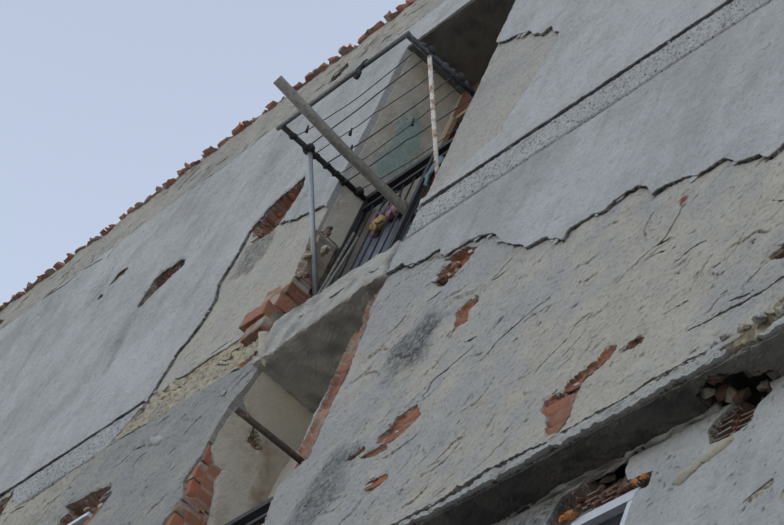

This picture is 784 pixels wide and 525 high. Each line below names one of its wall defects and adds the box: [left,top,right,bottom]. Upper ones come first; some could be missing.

peeling [0,181,338,525]
peeling [264,150,784,525]